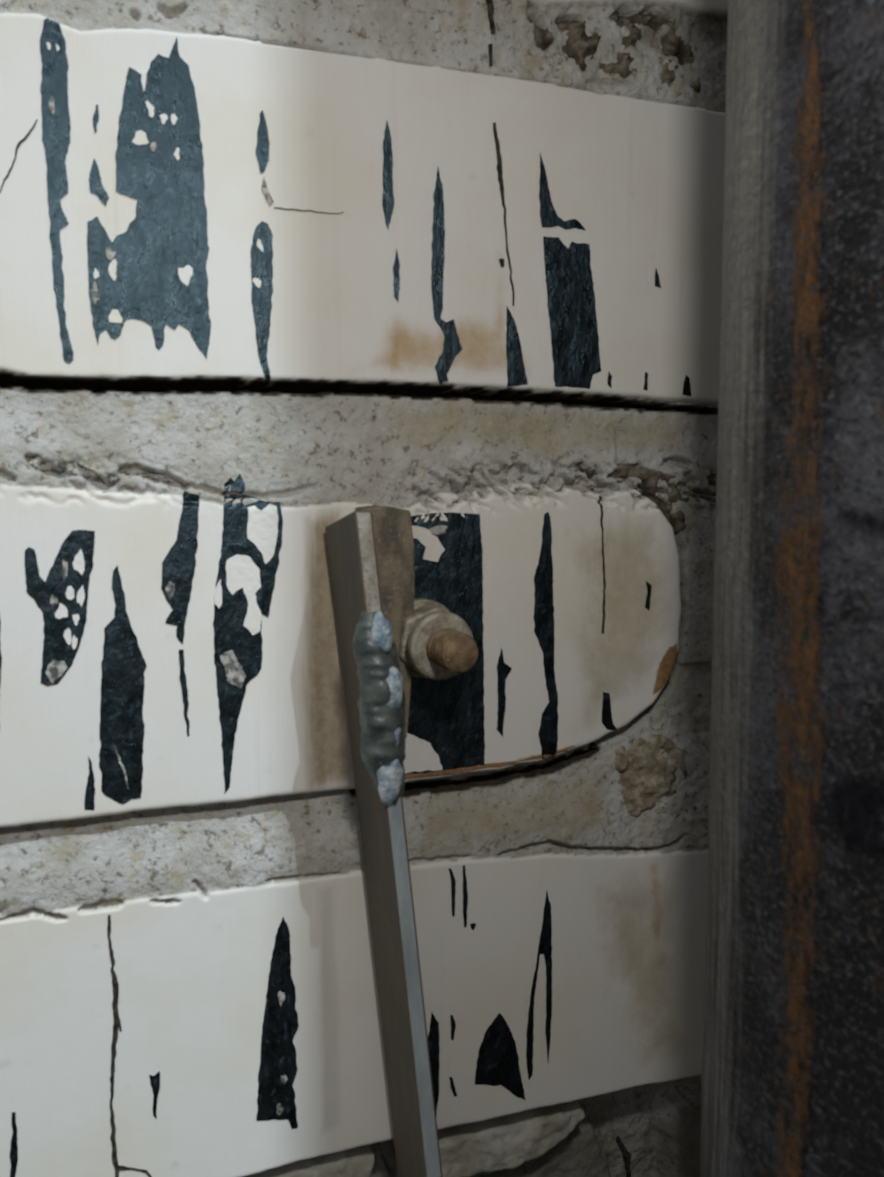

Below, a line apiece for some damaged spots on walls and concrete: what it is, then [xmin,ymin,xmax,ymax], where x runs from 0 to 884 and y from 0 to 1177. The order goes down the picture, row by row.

peeling [40,18,74,364]
peeling [87,37,211,359]
peeling [250,221,273,383]
peeling [539,152,612,389]
peeling [25,456,200,736]
peeling [84,565,147,810]
peeling [213,474,283,794]
peeling [403,512,512,774]
peeling [533,512,558,759]
crack [107,915,152,1177]
peeling [256,917,299,1129]
peeling [475,890,552,1100]